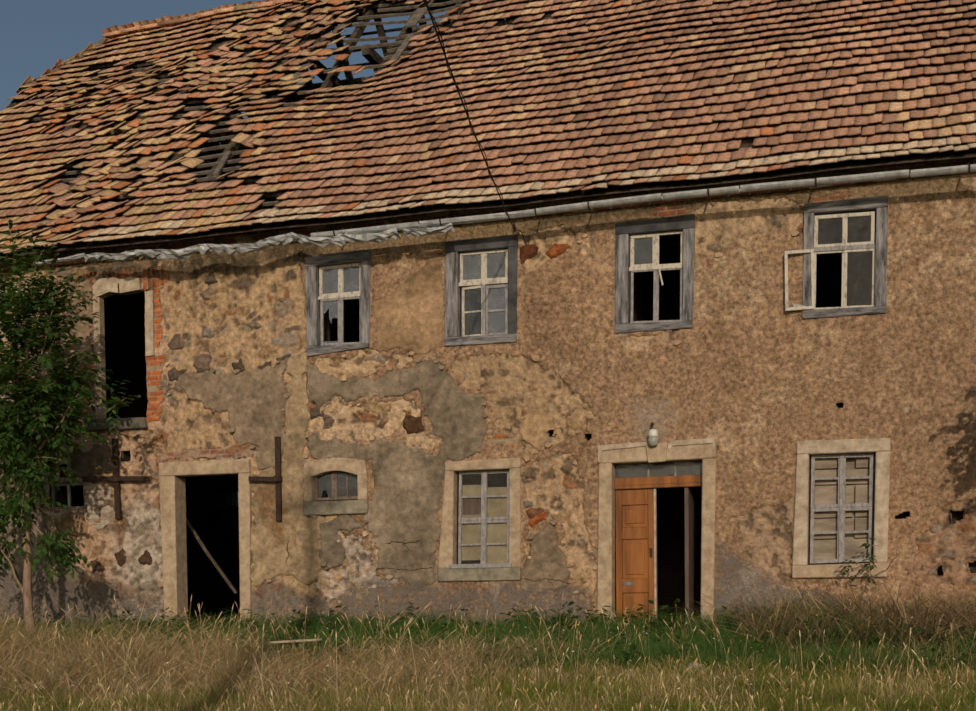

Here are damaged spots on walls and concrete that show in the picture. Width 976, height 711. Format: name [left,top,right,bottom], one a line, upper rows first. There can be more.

flaking render [518,225,588,272]
flaking render [0,247,441,629]
flaking render [439,354,597,599]
flaking render [906,501,976,586]